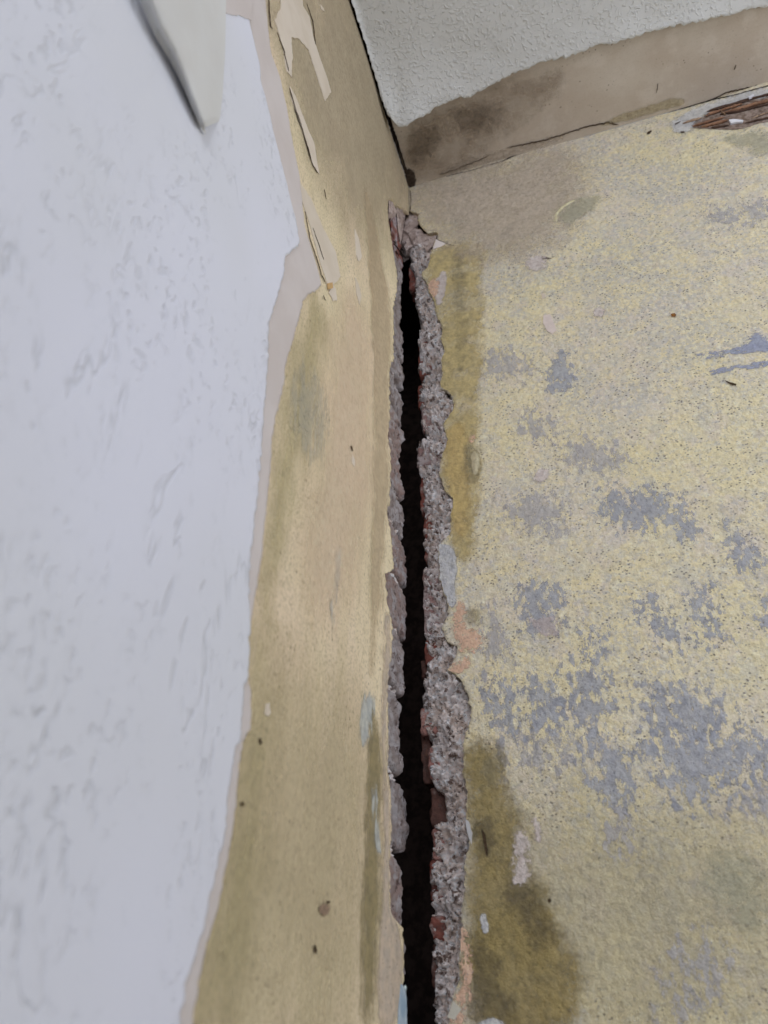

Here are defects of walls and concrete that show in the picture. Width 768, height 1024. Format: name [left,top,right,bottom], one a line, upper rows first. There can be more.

crack [350,0,472,1024]
water stain [407,109,580,560]
flaking render [675,93,768,133]
water stain [462,743,579,1024]